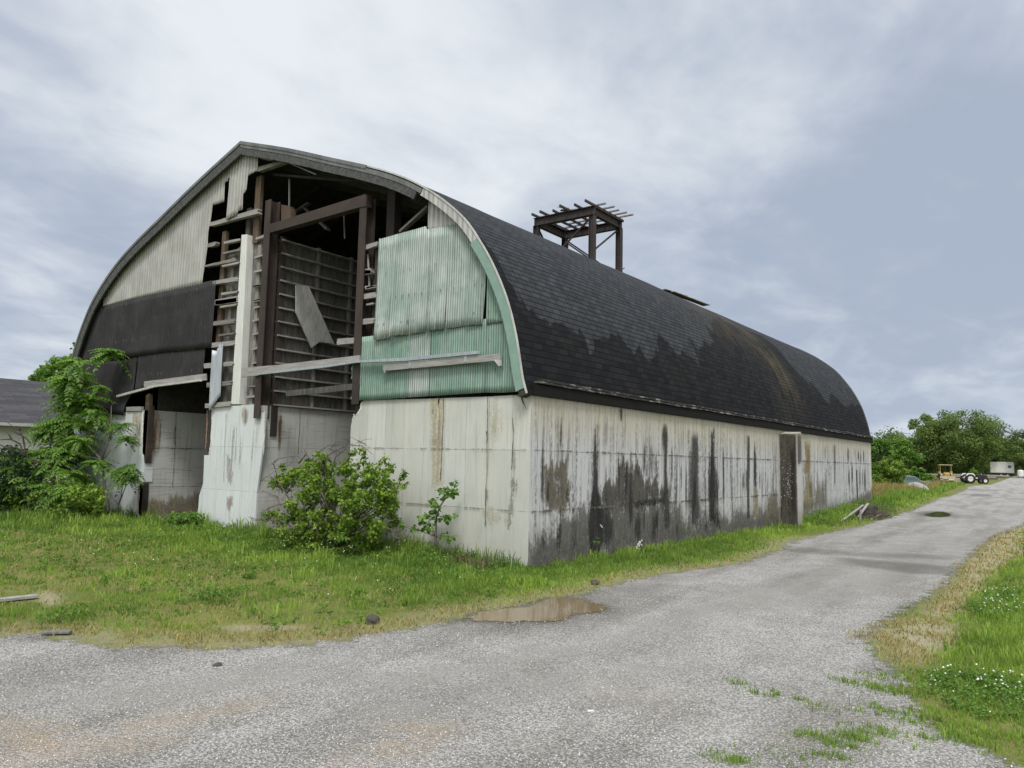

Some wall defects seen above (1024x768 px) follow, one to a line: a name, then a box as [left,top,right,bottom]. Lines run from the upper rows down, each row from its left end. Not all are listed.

leakage [528,421,872,566]